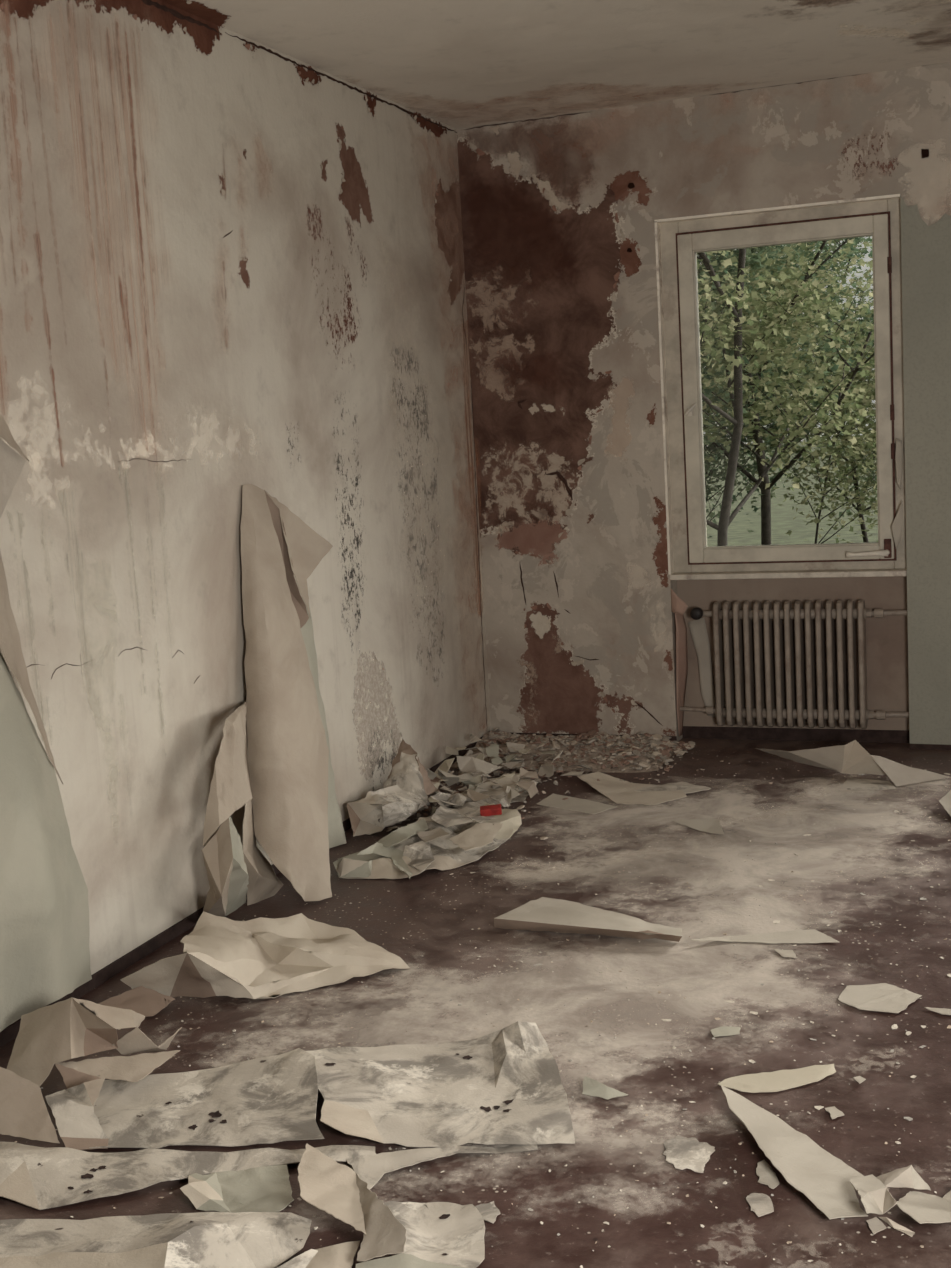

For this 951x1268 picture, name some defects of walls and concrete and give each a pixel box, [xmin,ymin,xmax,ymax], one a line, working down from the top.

peeling [0,0,231,56]
damp [116,23,144,275]
damp [307,204,367,363]
peeling [320,123,373,227]
damp [52,368,63,466]
damp [333,393,364,650]
damp [391,348,443,678]
peeling [434,133,676,736]